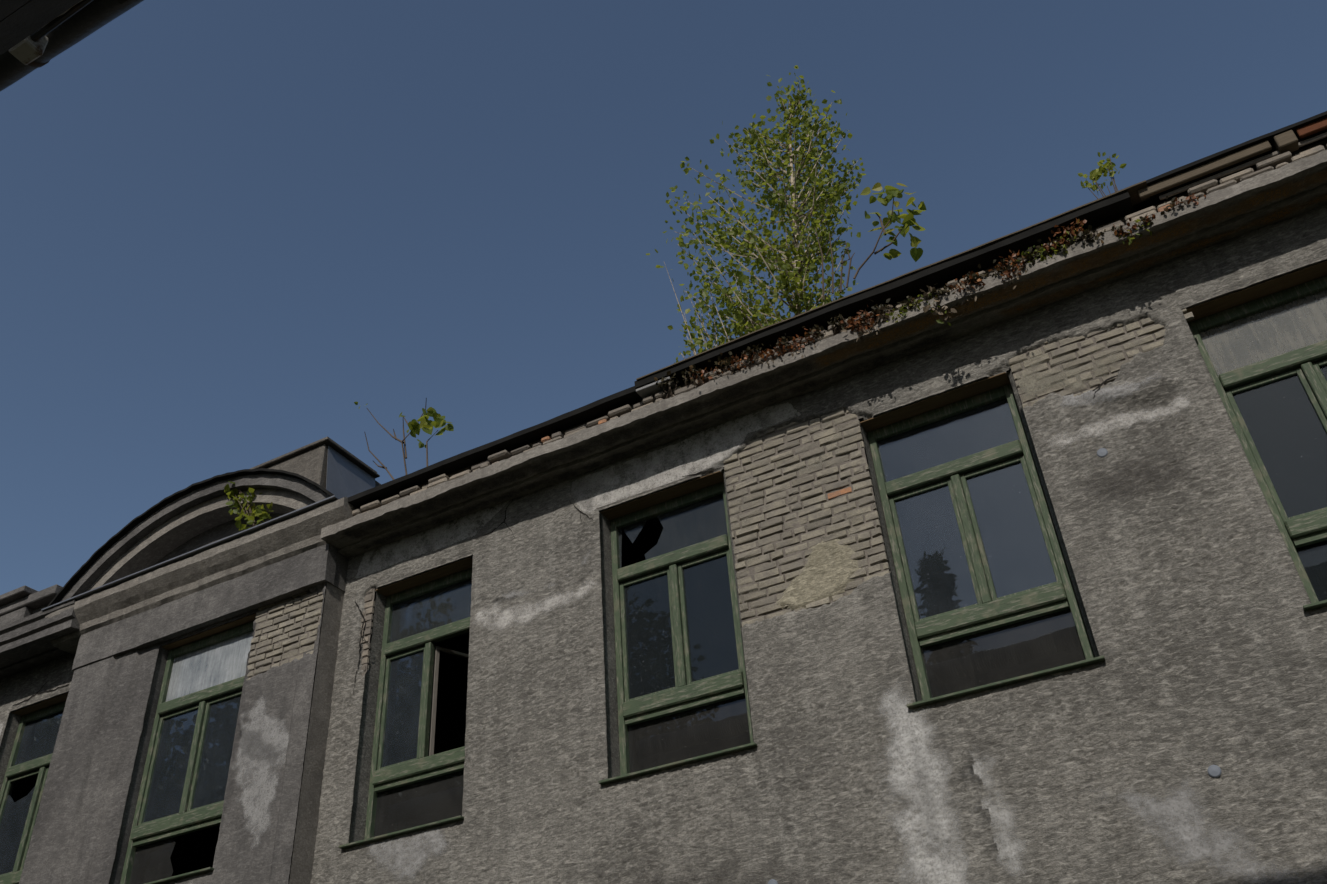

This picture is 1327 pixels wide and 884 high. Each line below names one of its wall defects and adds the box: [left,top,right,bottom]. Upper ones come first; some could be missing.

flaking render [571,402,890,627]
flaking render [247,585,327,680]
leakage [883,693,967,884]
leakage [973,762,989,783]
leakage [983,802,1021,872]